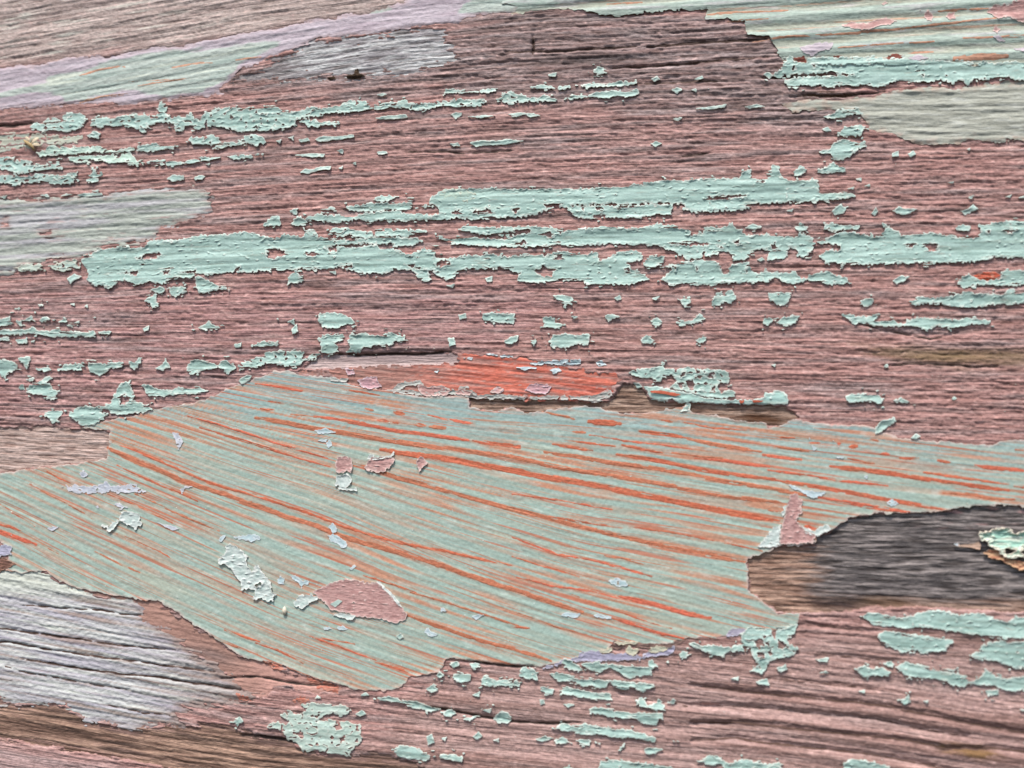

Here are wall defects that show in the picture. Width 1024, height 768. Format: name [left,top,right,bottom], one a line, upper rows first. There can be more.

peeling [0,62,639,199]
peeling [763,0,1024,91]
peeling [15,107,1024,426]
peeling [0,301,408,532]
peeling [845,390,915,434]
peeling [0,534,465,768]
peeling [327,523,347,548]
peeling [361,484,1024,768]